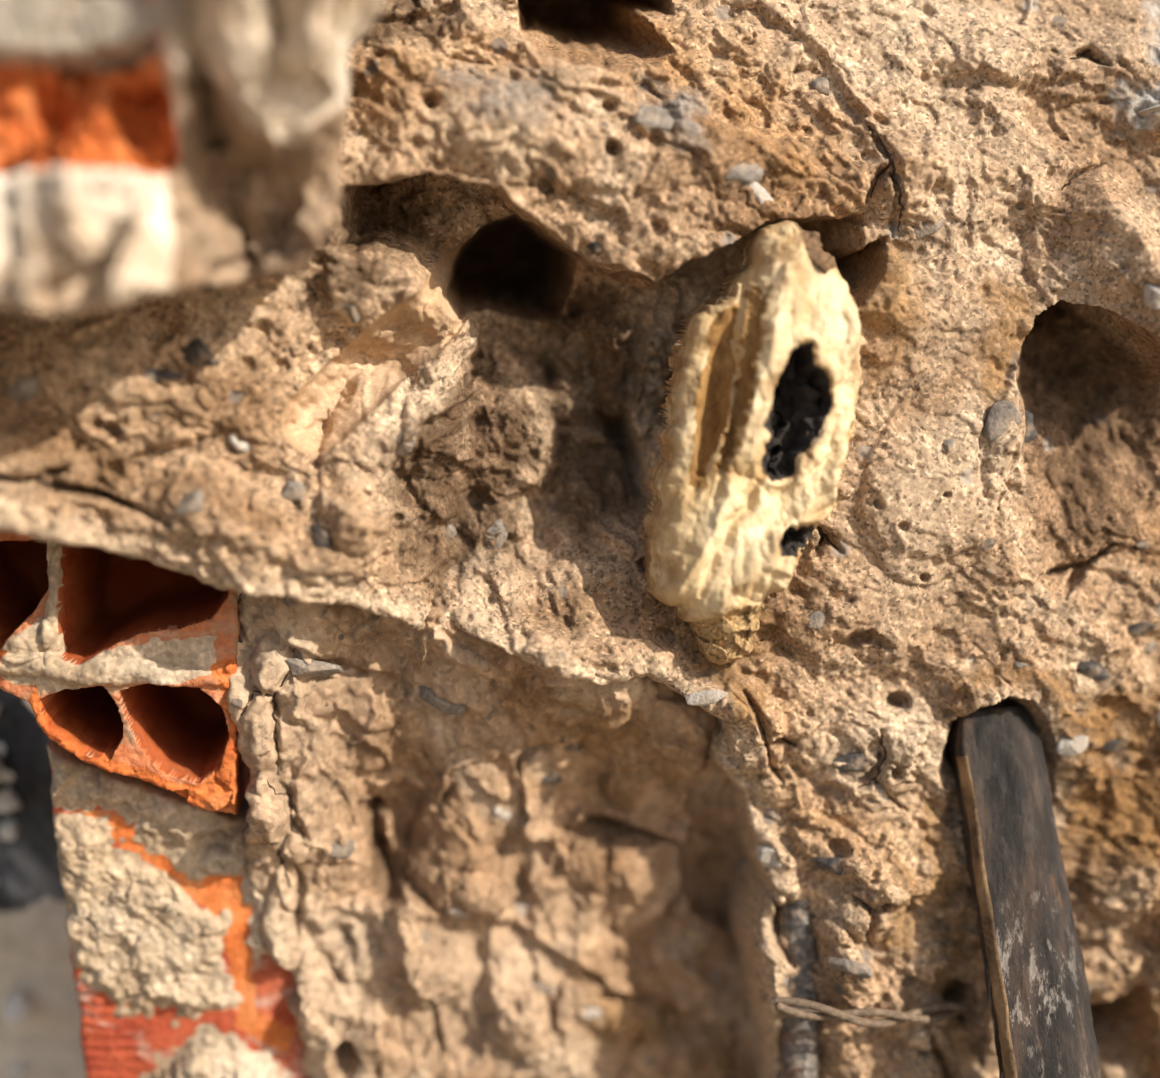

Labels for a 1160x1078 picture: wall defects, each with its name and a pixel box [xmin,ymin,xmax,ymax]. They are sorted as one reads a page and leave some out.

crack [0,470,176,531]
peeling [0,689,245,1028]
spalling [271,957,302,1020]